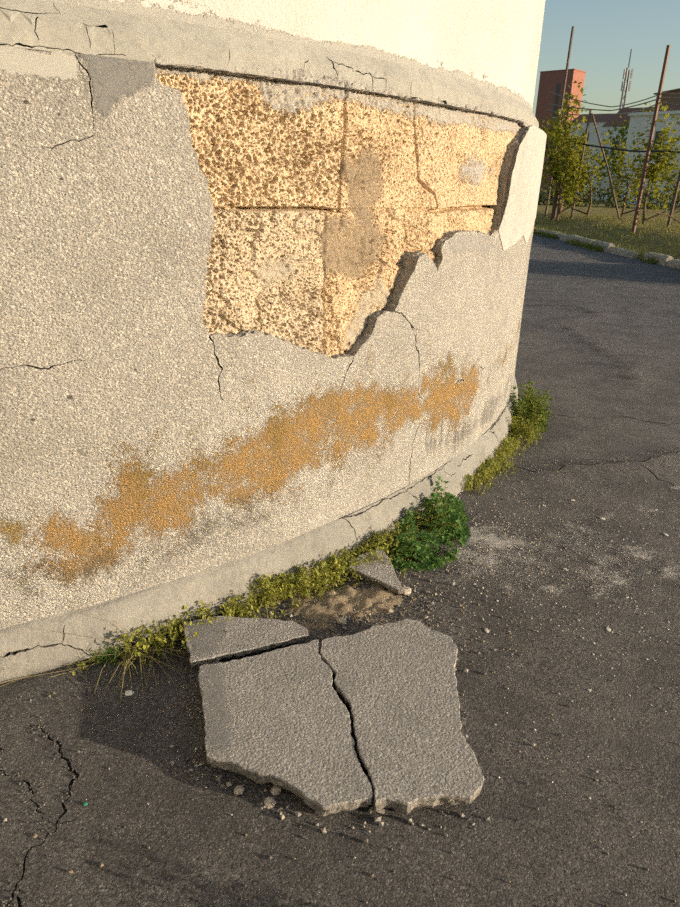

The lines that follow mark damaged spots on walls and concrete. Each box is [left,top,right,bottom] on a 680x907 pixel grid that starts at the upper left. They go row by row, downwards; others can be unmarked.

crack [0,3,126,149]
spalling [154,55,525,359]
crack [394,311,427,401]
crack [341,423,473,540]
crack [487,409,506,443]
crack [513,451,680,490]
crack [2,626,94,658]
crack [0,725,80,907]